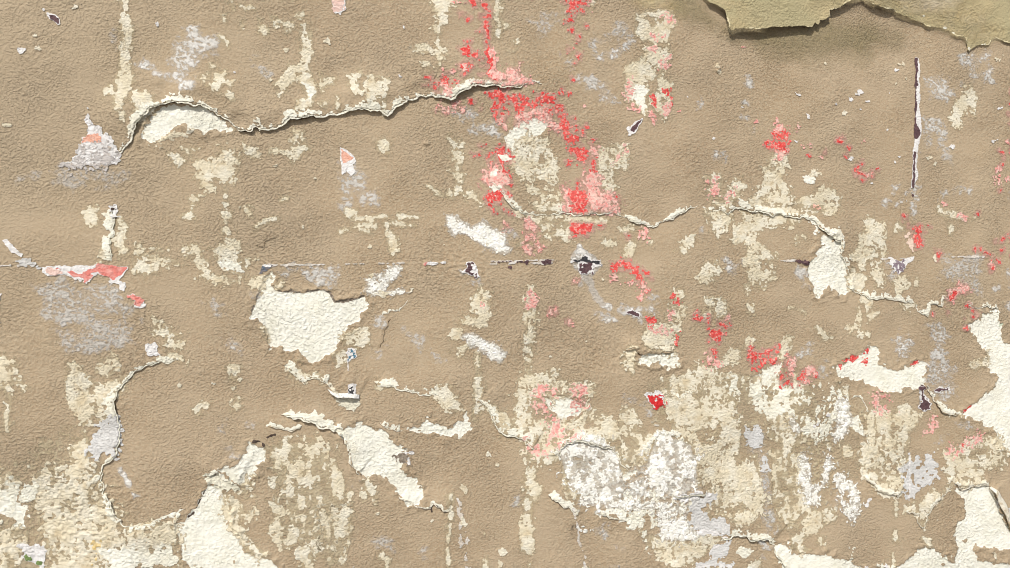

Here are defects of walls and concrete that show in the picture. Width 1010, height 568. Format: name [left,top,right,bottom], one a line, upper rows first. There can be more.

peeling [216,0,305,48]
peeling [563,0,598,64]
peeling [196,59,239,102]
peeling [269,48,402,117]
flaking render [118,88,313,233]
peeling [374,137,393,155]
peeling [425,78,655,265]
peeling [80,203,103,229]
flaking render [108,226,372,390]
peeling [0,349,424,568]